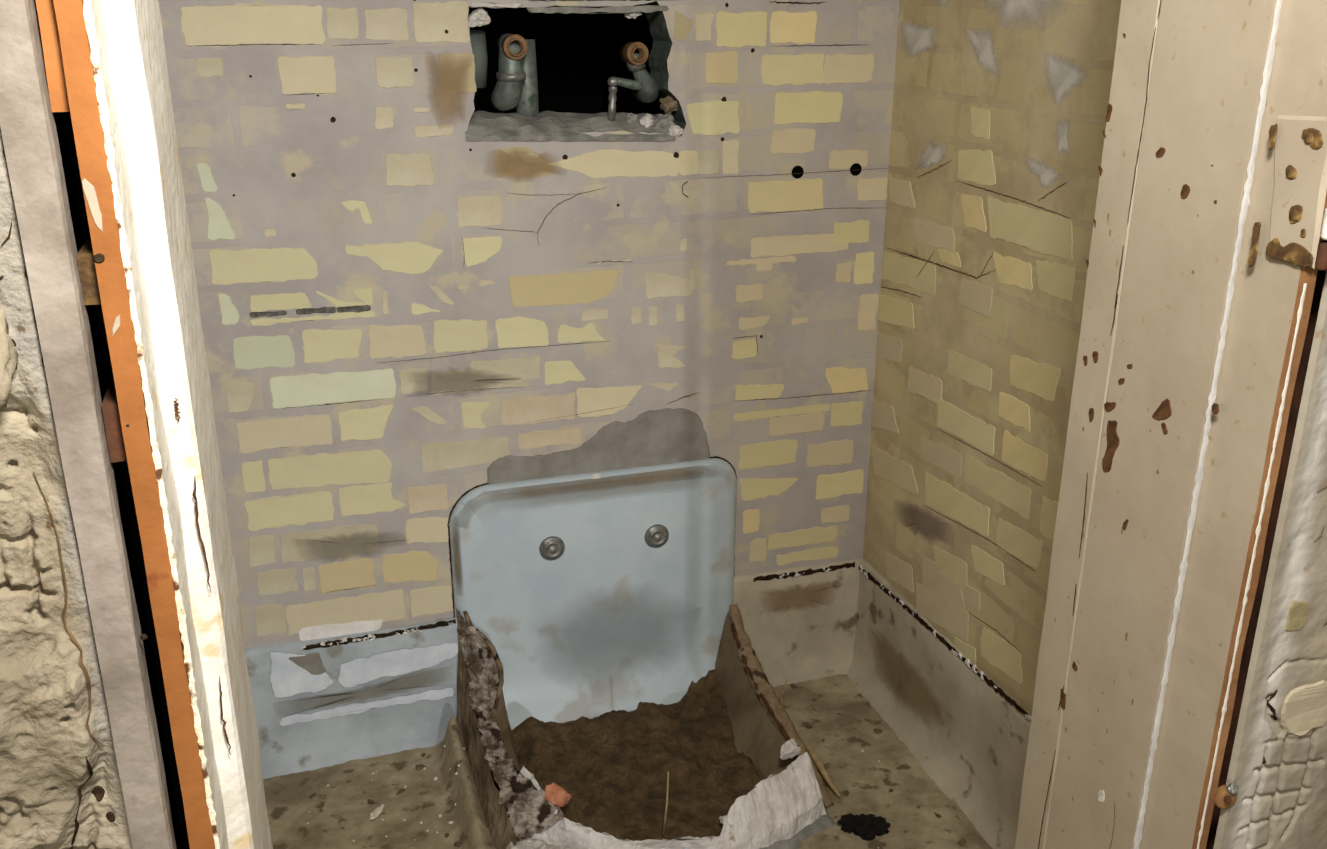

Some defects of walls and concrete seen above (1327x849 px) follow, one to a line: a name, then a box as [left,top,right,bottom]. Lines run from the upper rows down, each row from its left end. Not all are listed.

flaking render [180,1,477,110]
damp [435,66,463,117]
damp [498,155,549,177]
corrosion [1302,128,1323,150]
corrosion [1266,205,1313,267]
flaking render [494,11,1075,689]
peeling [83,0,220,849]
flaking render [197,163,686,698]
peeling [1197,283,1307,849]
crack [33,471,104,849]
peeling [219,677,231,755]
peeling [279,688,454,726]